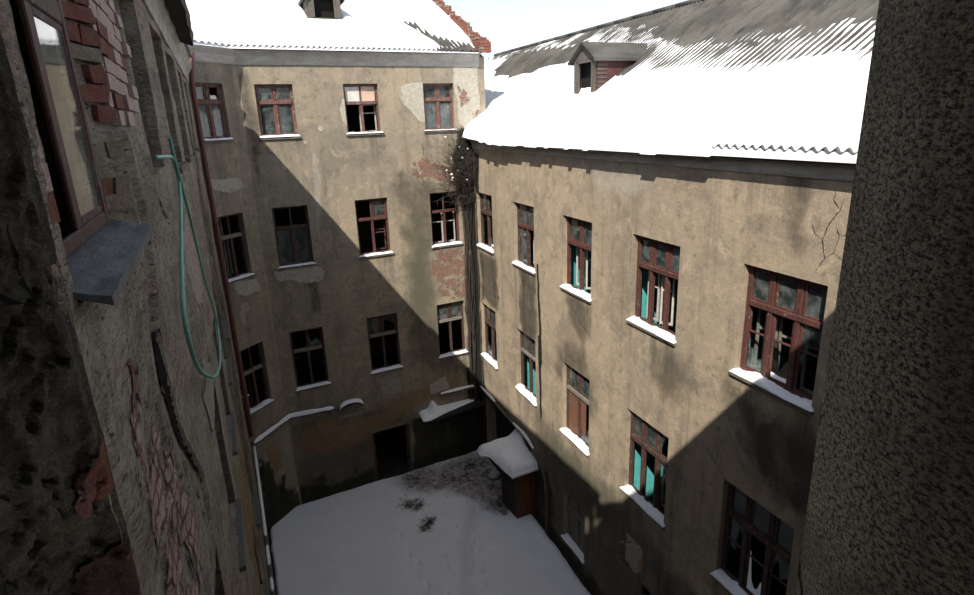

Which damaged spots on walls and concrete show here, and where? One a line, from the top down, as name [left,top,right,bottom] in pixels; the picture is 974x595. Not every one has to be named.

flaking render [41,0,140,126]
peeling [399,82,425,122]
peeling [453,67,480,128]
leakage [196,160,286,549]
leakage [413,128,531,463]
leakage [519,264,542,419]
crack [813,191,846,275]
spalling [74,439,114,521]
spalling [71,537,141,595]
peeling [127,358,203,595]
leakage [535,434,692,595]
leakage [741,404,816,511]